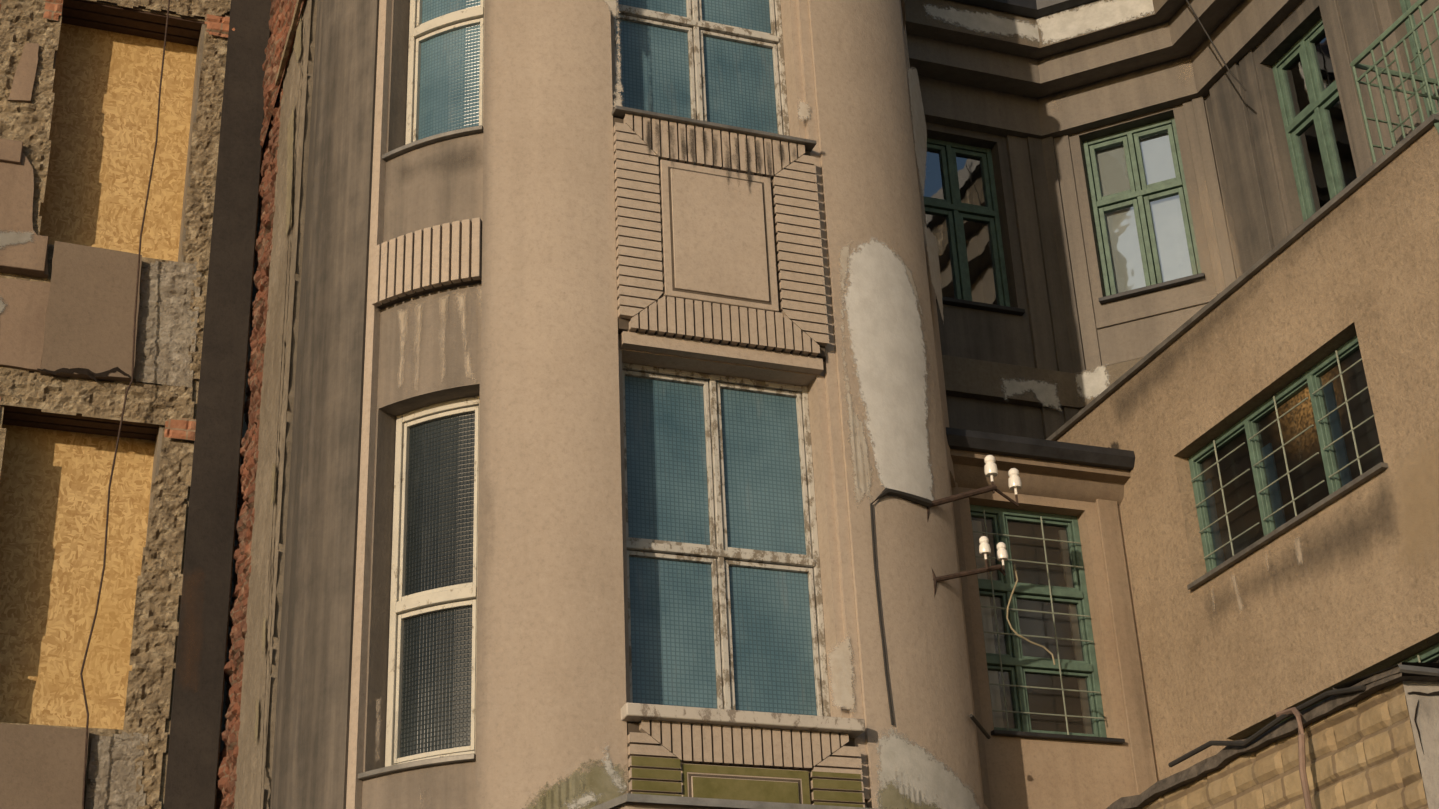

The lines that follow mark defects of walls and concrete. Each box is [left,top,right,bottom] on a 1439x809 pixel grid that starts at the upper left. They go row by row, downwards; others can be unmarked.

spalling [286,104,294,235]
peeling [907,68,927,194]
spalling [0,0,235,809]
peeling [839,224,944,506]
peeling [1001,378,1061,410]
peeling [1076,366,1110,401]
peeling [876,728,980,809]